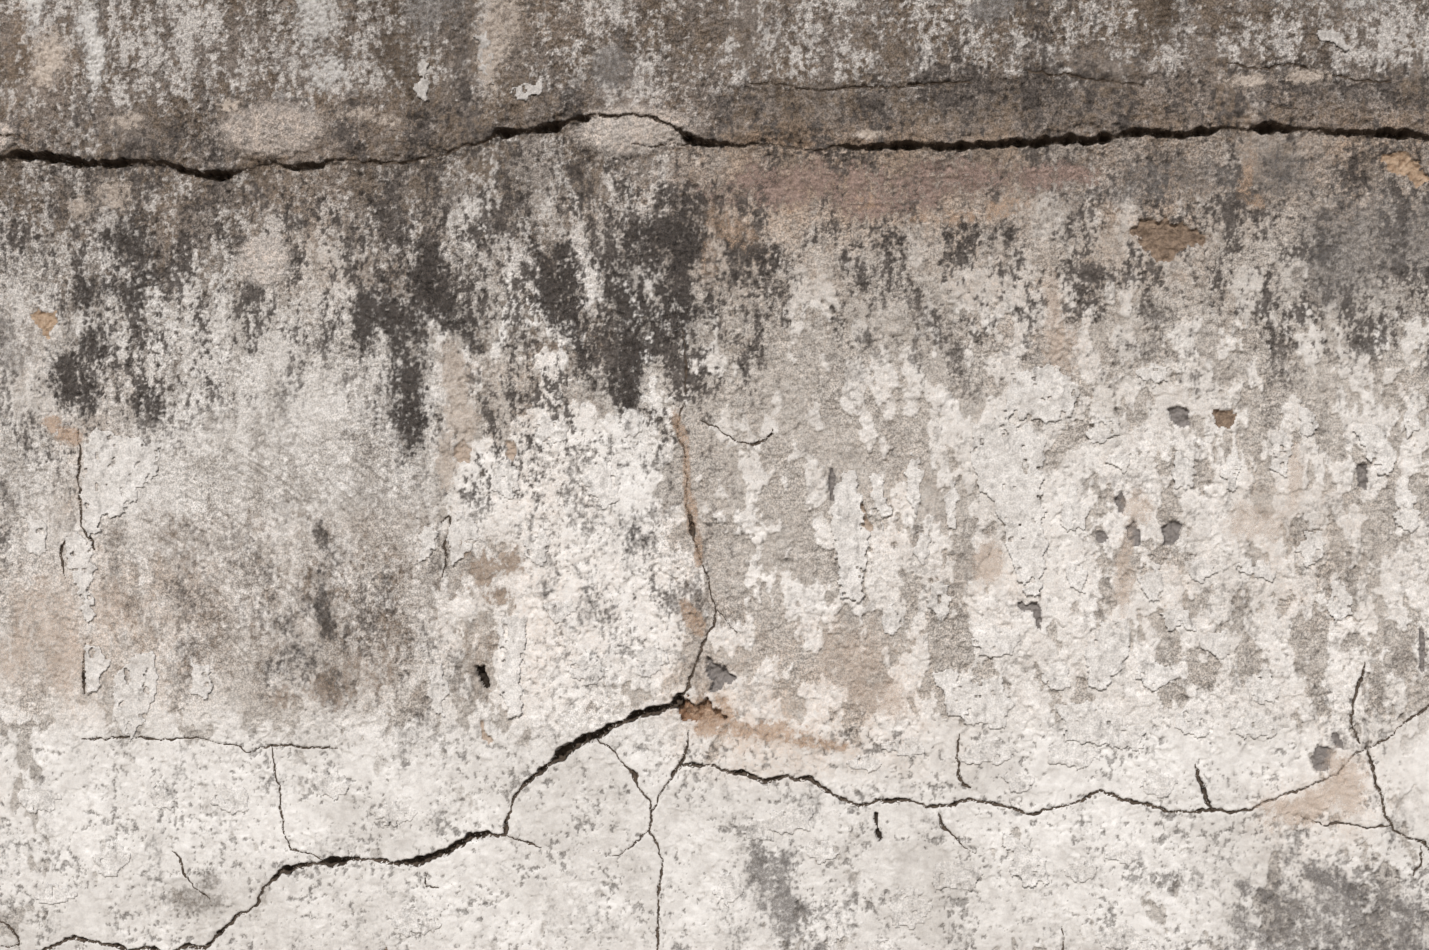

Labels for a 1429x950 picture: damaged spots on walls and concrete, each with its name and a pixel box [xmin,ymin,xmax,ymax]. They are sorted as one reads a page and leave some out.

damp [75,0,106,93]
crack [0,62,1429,182]
damp [31,324,119,432]
damp [67,179,163,308]
damp [349,237,488,465]
damp [523,183,789,409]
spalling [1168,406,1191,428]
peeling [828,452,931,602]
peeling [970,364,1109,630]
spalling [1114,492,1141,546]
spalling [678,657,737,722]
crack [0,328,1429,950]